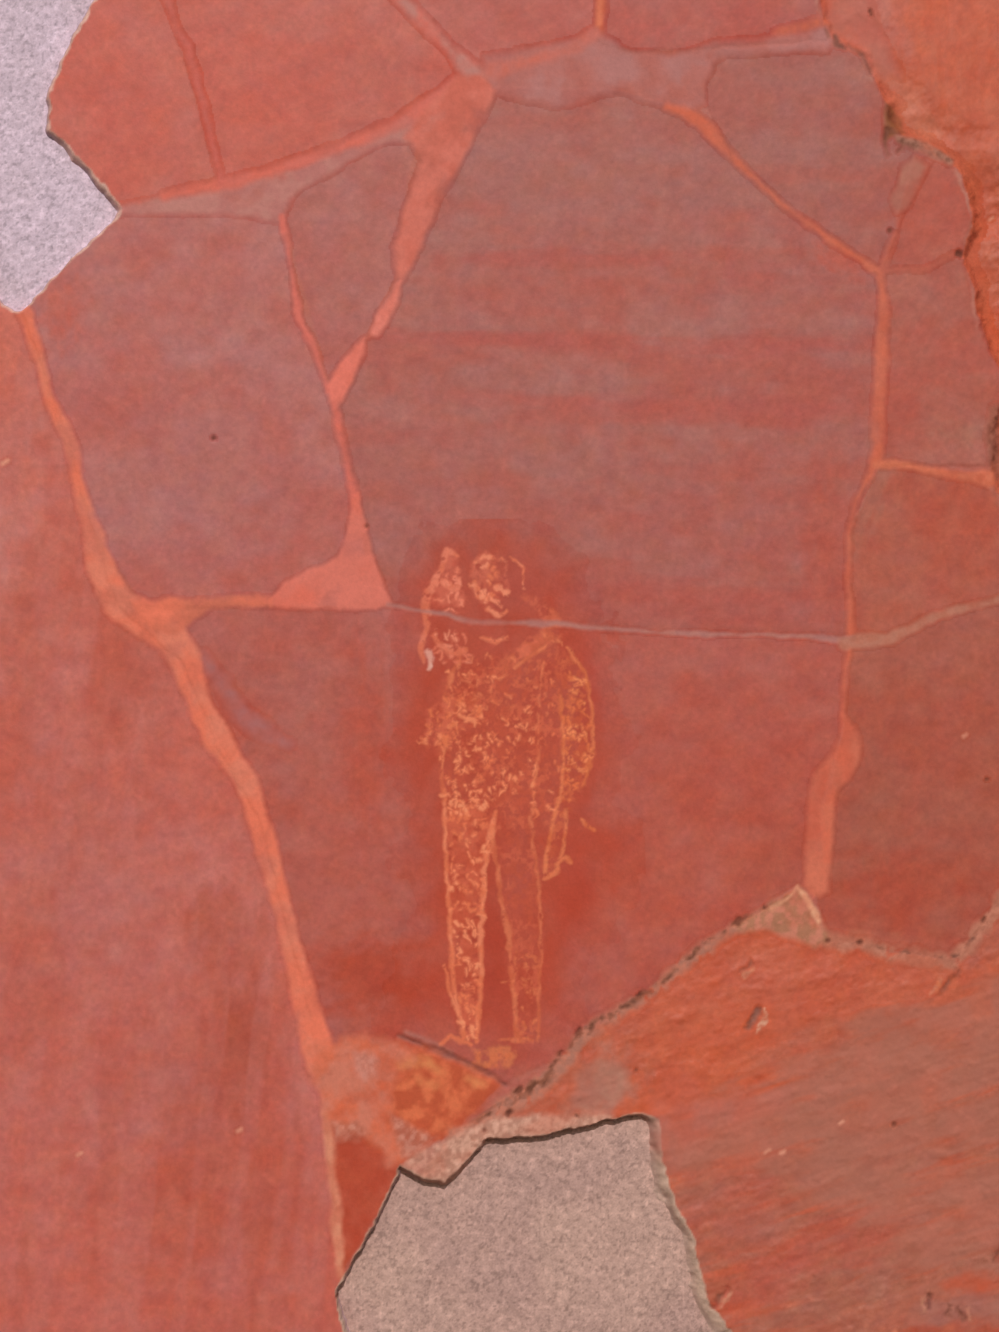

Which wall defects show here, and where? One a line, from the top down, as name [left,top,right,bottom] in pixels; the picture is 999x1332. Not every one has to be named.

spalling [0,0,118,312]
crack [115,0,999,634]
crack [14,304,999,1282]
spalling [741,1004,771,1035]
spalling [329,1039,735,1332]